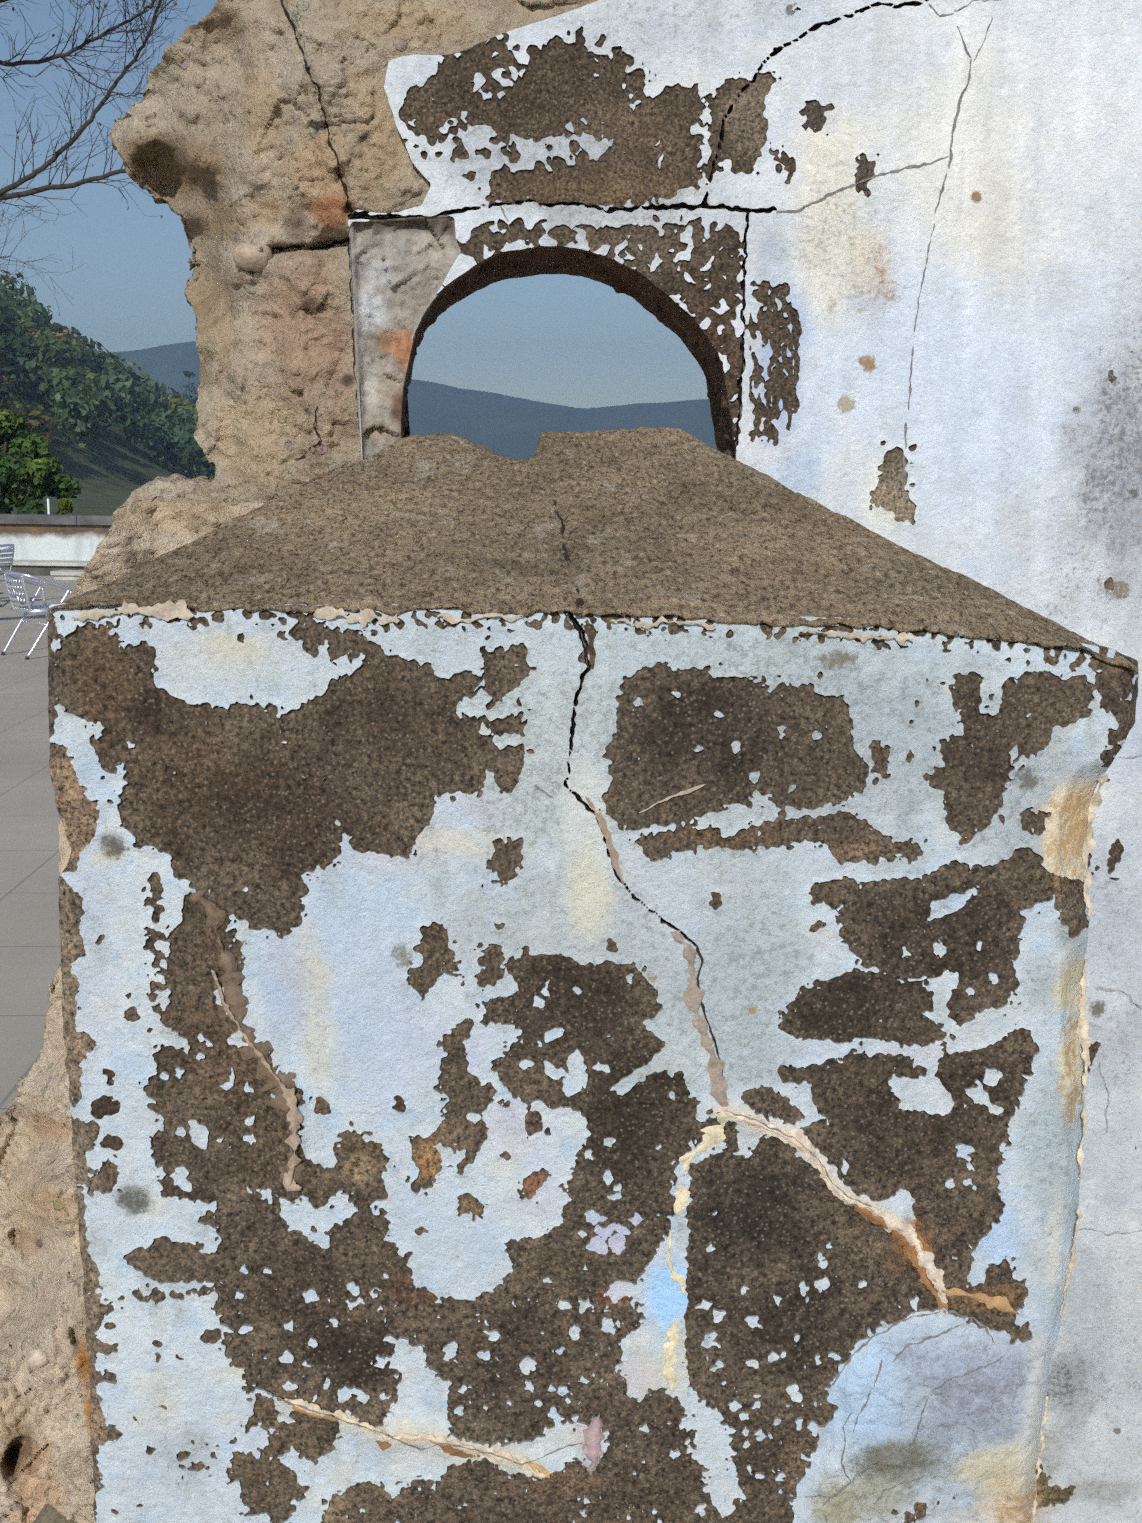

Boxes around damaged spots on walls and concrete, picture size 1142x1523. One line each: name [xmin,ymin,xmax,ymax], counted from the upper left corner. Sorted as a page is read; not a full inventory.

spalling [68,0,802,599]
crack [272,0,993,496]
peeling [799,100,835,136]
peeling [854,153,879,198]
peeling [869,441,916,525]
peeling [0,599,1139,1523]
crack [553,500,1019,1392]
crack [260,1389,583,1480]